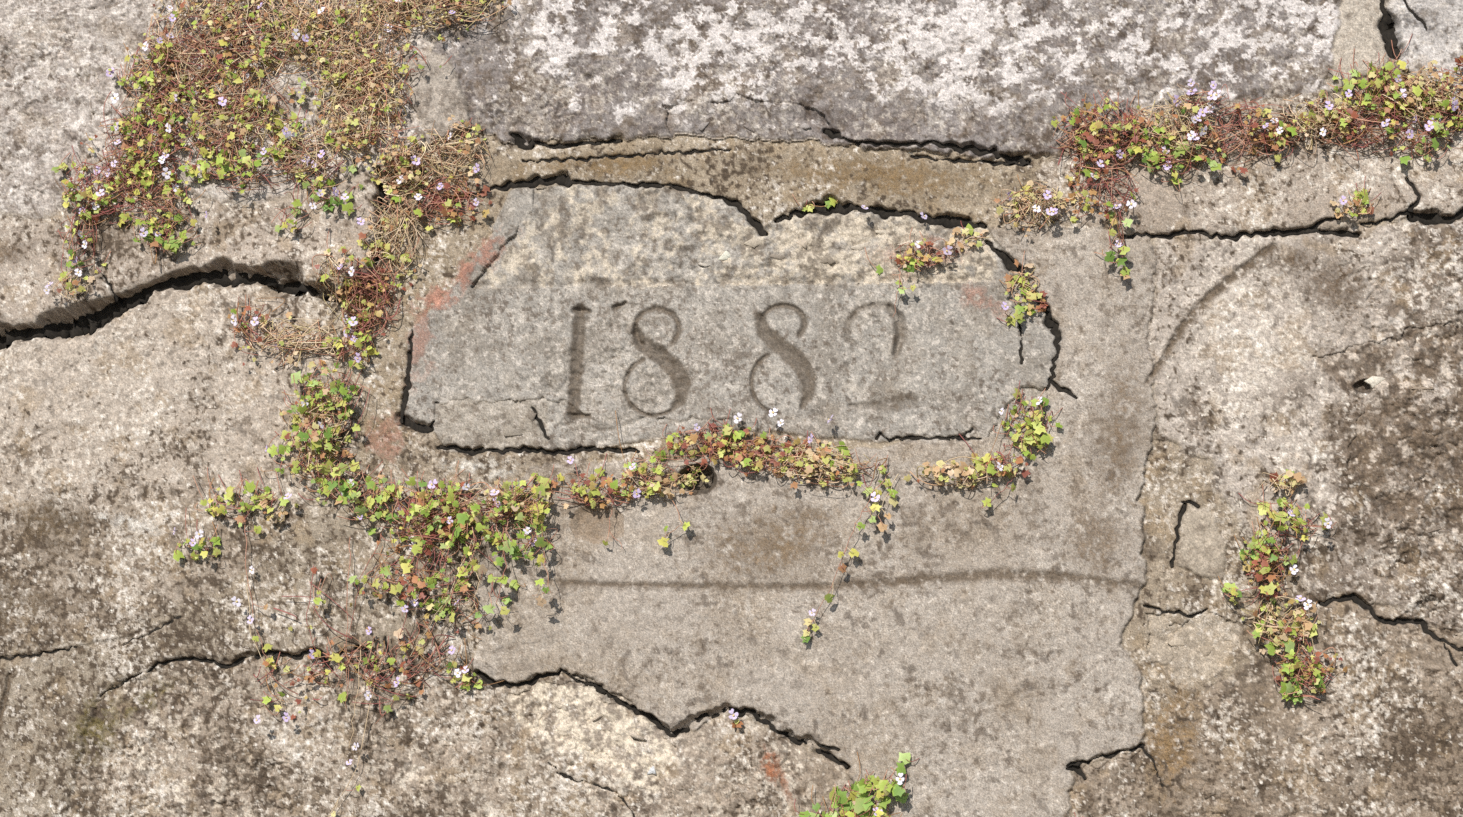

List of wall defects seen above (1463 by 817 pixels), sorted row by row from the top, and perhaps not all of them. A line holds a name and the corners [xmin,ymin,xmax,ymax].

crack [1378,0,1427,59]
crack [1118,178,1463,242]
crack [0,269,340,350]
crack [1319,593,1463,666]
crack [477,668,850,769]
crack [548,762,635,817]
crack [1067,744,1164,787]